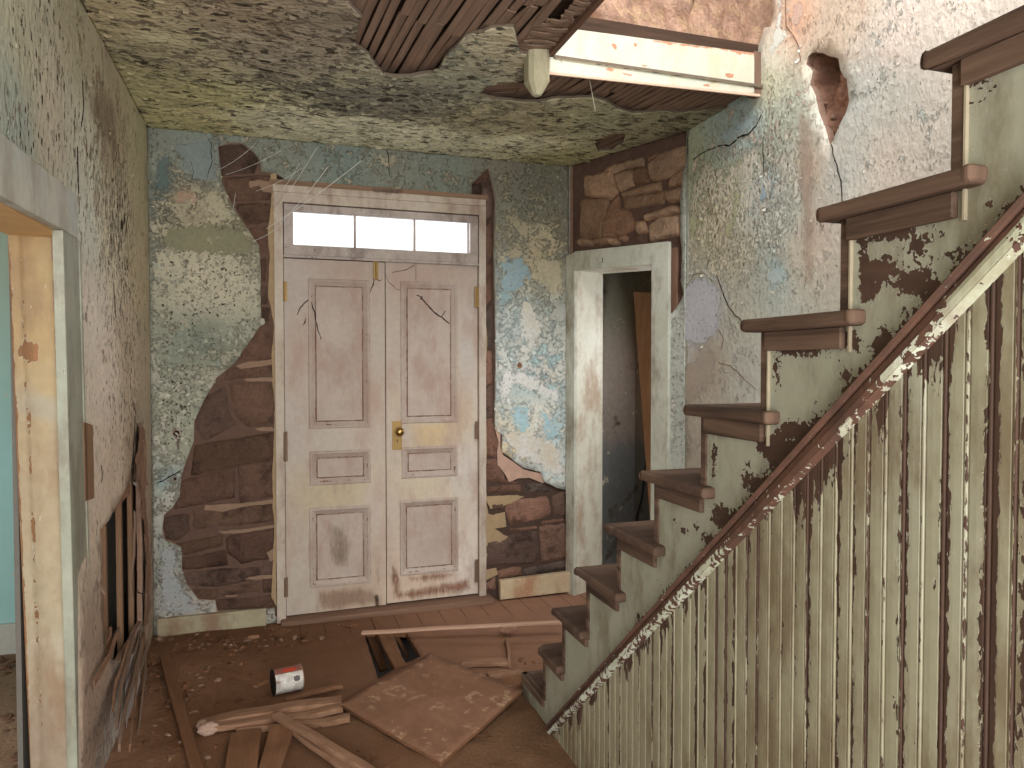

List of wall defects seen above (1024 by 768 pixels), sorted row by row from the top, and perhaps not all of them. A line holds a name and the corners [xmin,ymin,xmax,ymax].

crack [687,114,764,178]
crack [831,144,843,201]
spalling [81,0,902,753]
crack [685,273,755,389]